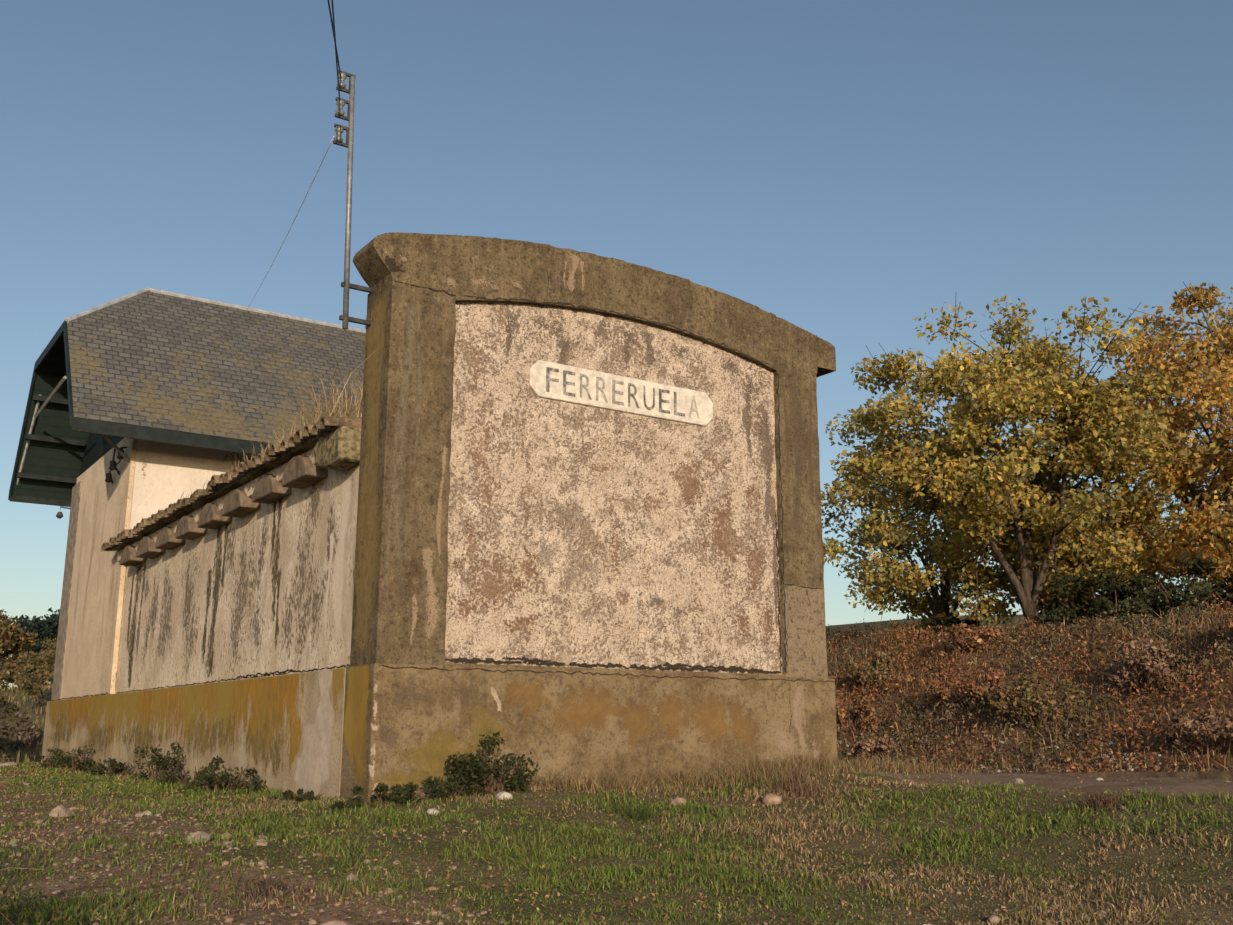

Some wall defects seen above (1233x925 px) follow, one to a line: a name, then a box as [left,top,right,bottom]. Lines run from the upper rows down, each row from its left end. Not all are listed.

leakage [71,482,339,772]
peeling [447,344,548,636]
leakage [332,299,814,782]
peeling [589,462,687,616]
peeling [643,450,778,653]